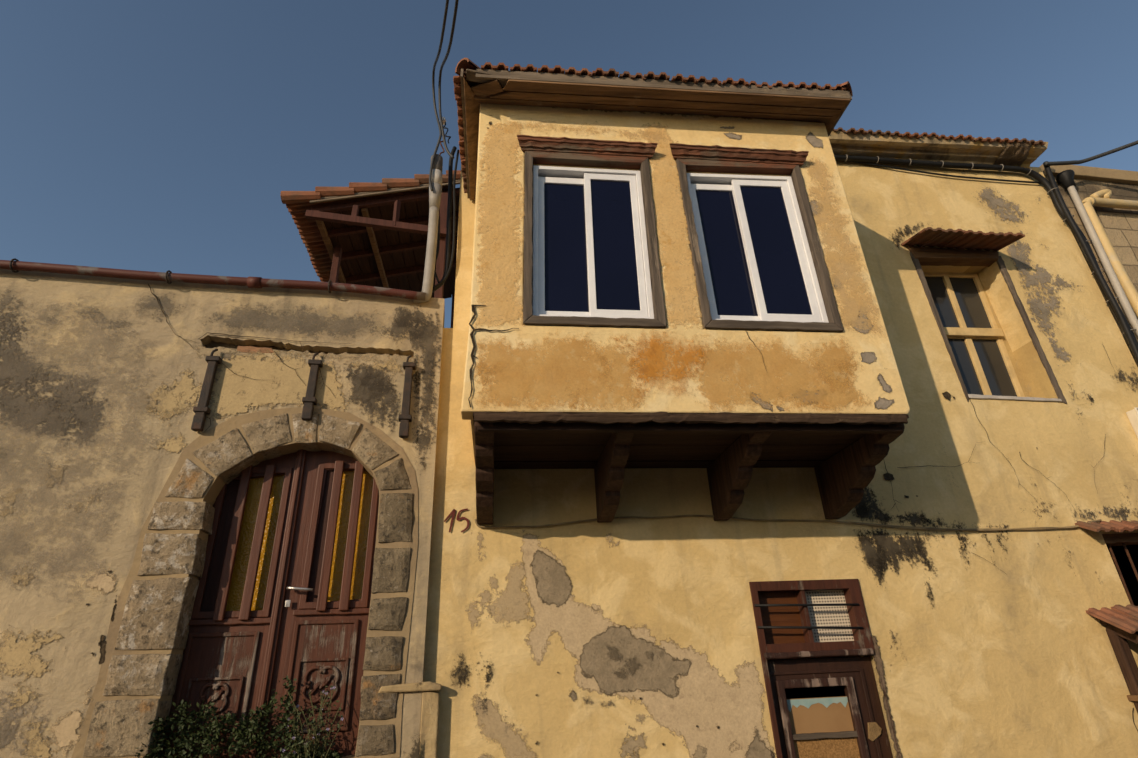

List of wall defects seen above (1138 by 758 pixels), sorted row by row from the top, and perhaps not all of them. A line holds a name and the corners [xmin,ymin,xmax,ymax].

peeling [805,132,881,334]
damp [891,223,924,249]
damp [0,290,110,447]
damp [135,296,183,322]
crack [148,284,351,398]
damp [210,304,442,470]
peeling [861,352,894,409]
mould [852,487,1008,606]
crack [883,398,1071,511]
mould [1071,485,1138,522]
peeling [465,530,775,758]